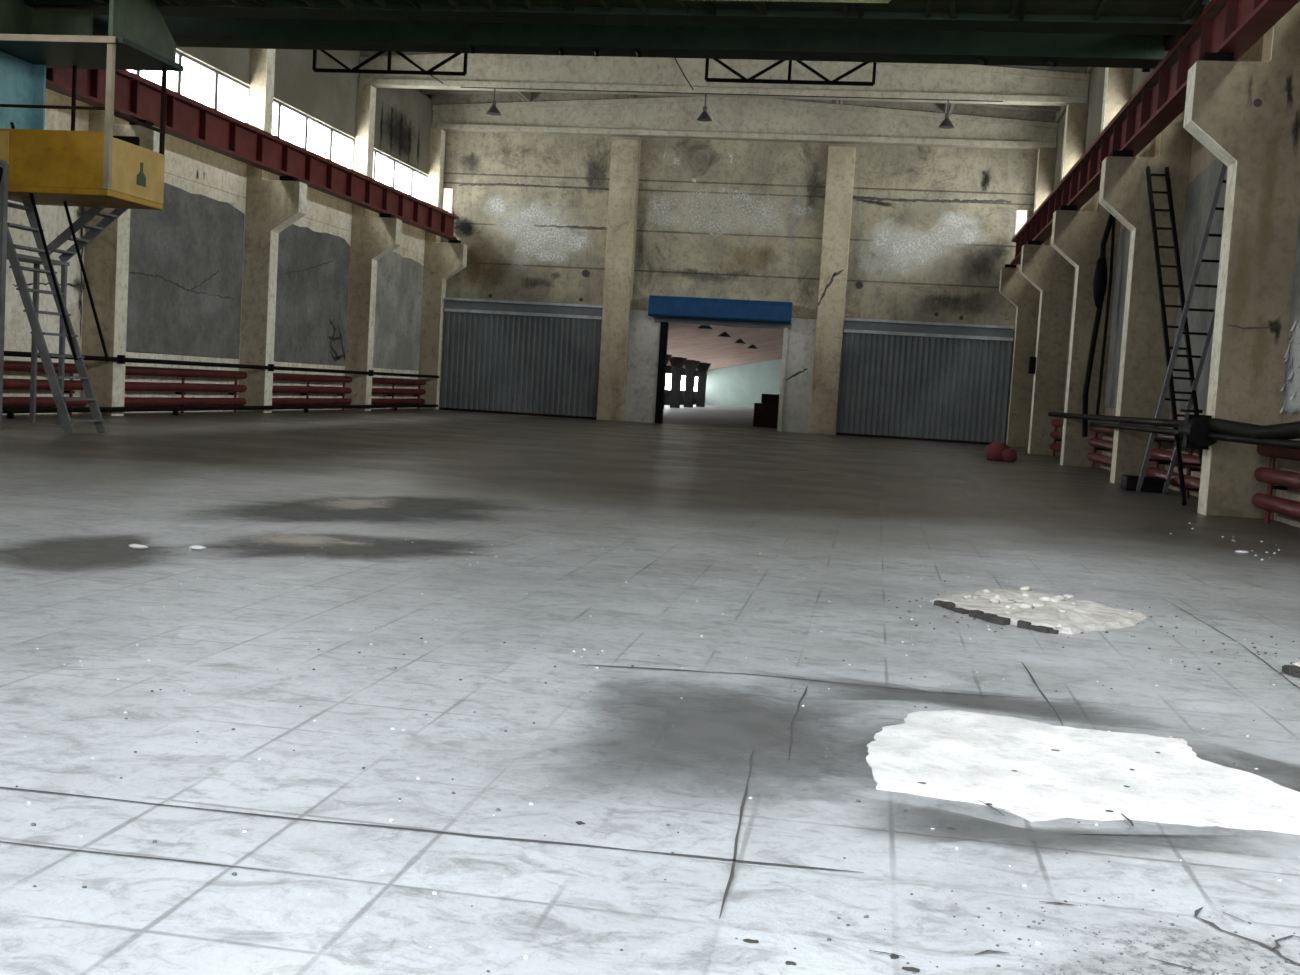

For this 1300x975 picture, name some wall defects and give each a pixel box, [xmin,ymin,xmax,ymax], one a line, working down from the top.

peeling [1280,319,1300,413]
water stain [329,500,379,508]
water stain [207,535,469,558]
spalling [934,600,1059,634]
crack [1164,599,1300,689]
spalling [1282,665,1300,678]
crack [1194,907,1300,965]